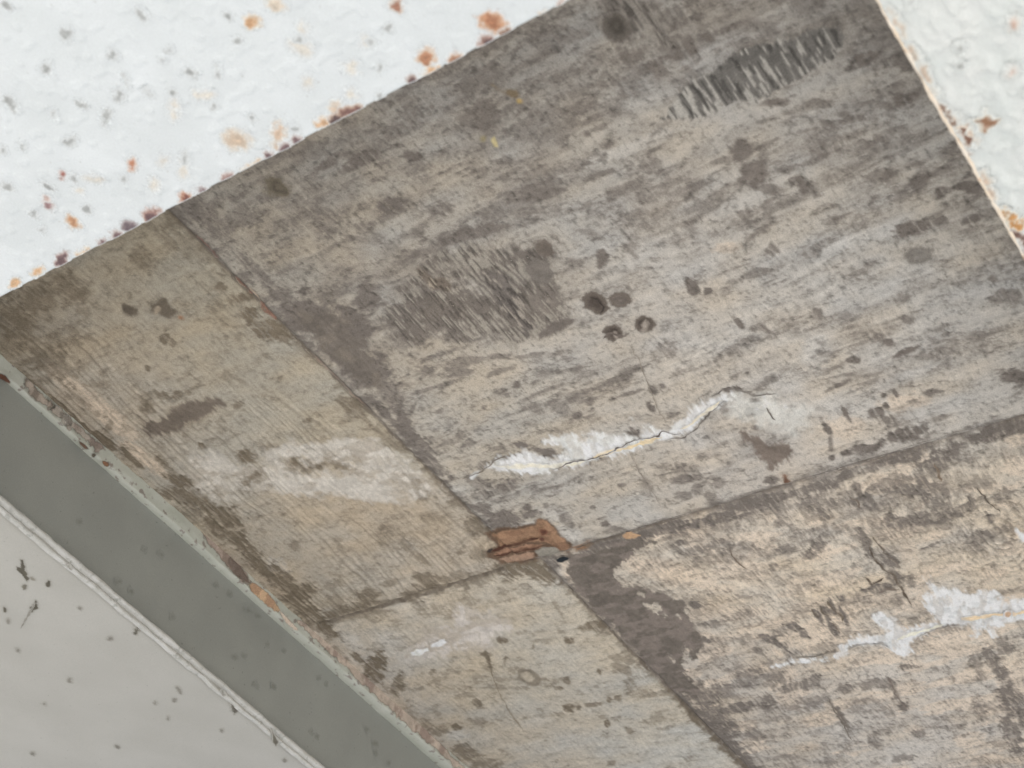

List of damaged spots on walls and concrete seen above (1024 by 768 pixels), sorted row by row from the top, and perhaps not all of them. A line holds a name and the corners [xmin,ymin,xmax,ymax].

corrosion [239,0,294,32]
corrosion [382,0,408,18]
corrosion [402,6,516,84]
corrosion [5,97,366,290]
corrosion [976,166,1024,255]
crack [461,347,826,506]
crack [967,488,1024,544]
peeling [481,517,706,699]
crack [769,537,1024,710]